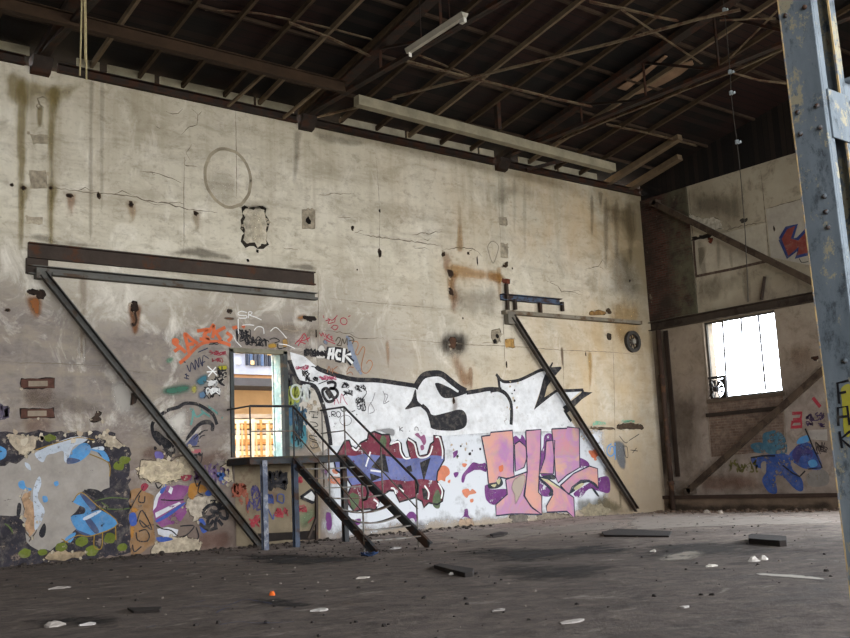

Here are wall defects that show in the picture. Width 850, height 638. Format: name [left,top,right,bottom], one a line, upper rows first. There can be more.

damp [9,75,60,227]
crack [57,109,217,213]
spalling [240,205,271,253]
corrosion [29,297,40,316]
corrosion [130,306,140,333]
peeling [6,429,45,459]
peeling [56,411,126,450]
peeling [135,444,202,488]
peeling [19,488,41,542]
peeling [181,495,217,524]
peeling [43,546,88,562]
peeling [150,534,202,554]